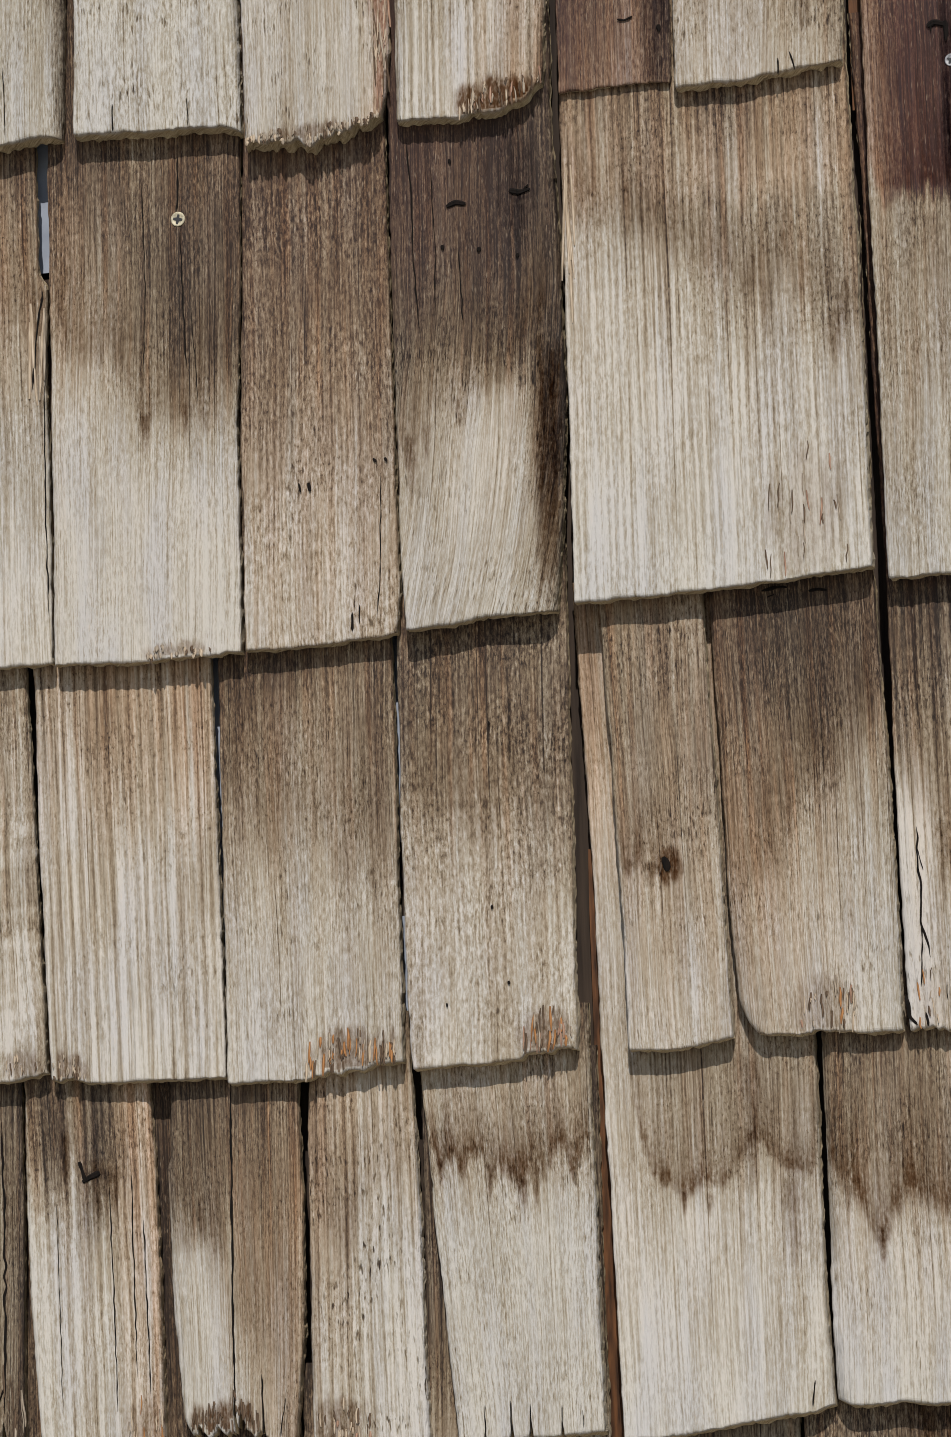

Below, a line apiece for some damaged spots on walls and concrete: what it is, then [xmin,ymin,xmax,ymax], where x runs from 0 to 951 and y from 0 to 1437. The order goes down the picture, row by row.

damp [432,1132,484,1179]
damp [489,1128,588,1195]
damp [655,1170,726,1201]
damp [831,1147,867,1209]
damp [873,1156,951,1257]